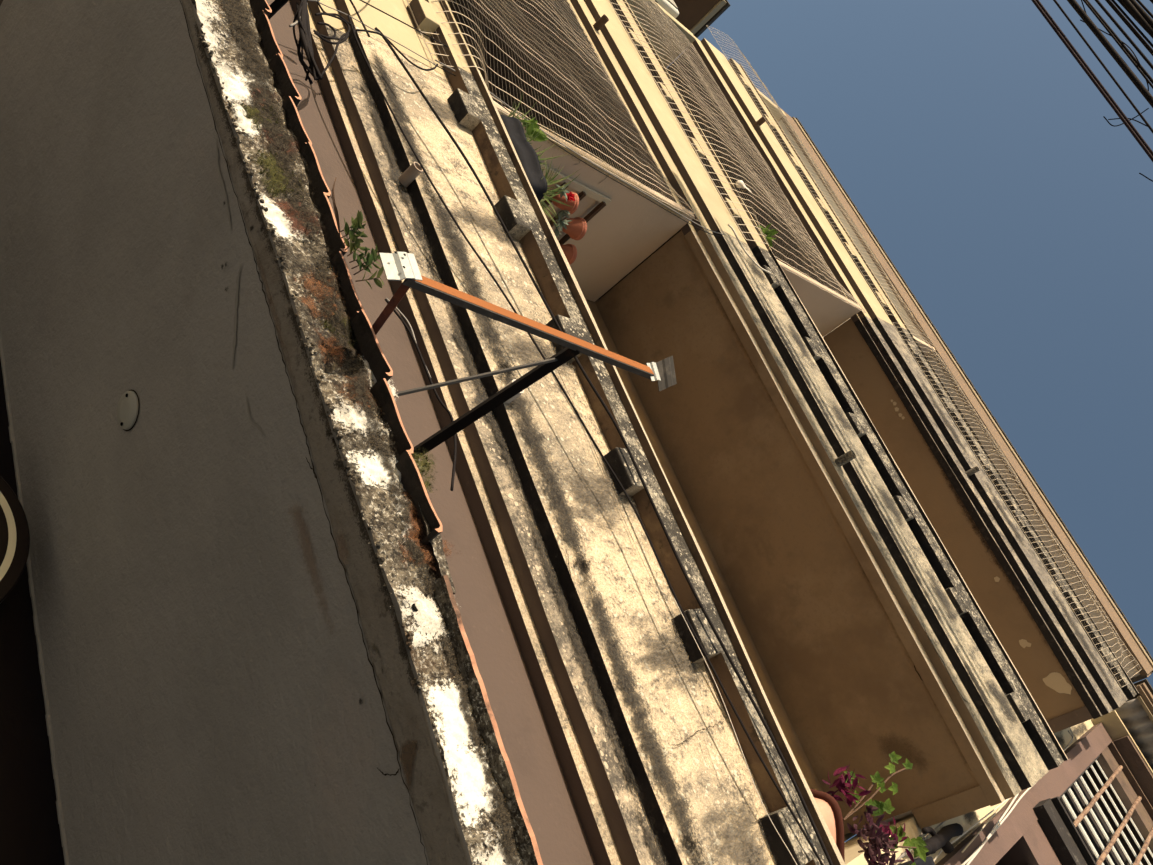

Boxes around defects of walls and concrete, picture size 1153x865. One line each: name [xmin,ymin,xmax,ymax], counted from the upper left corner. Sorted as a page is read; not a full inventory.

crack [180,1,428,865]
damp [218,0,523,865]
damp [446,301,667,865]
damp [511,396,771,865]
damp [854,318,1046,641]
damp [955,644,1019,758]
peeling [1043,672,1072,695]